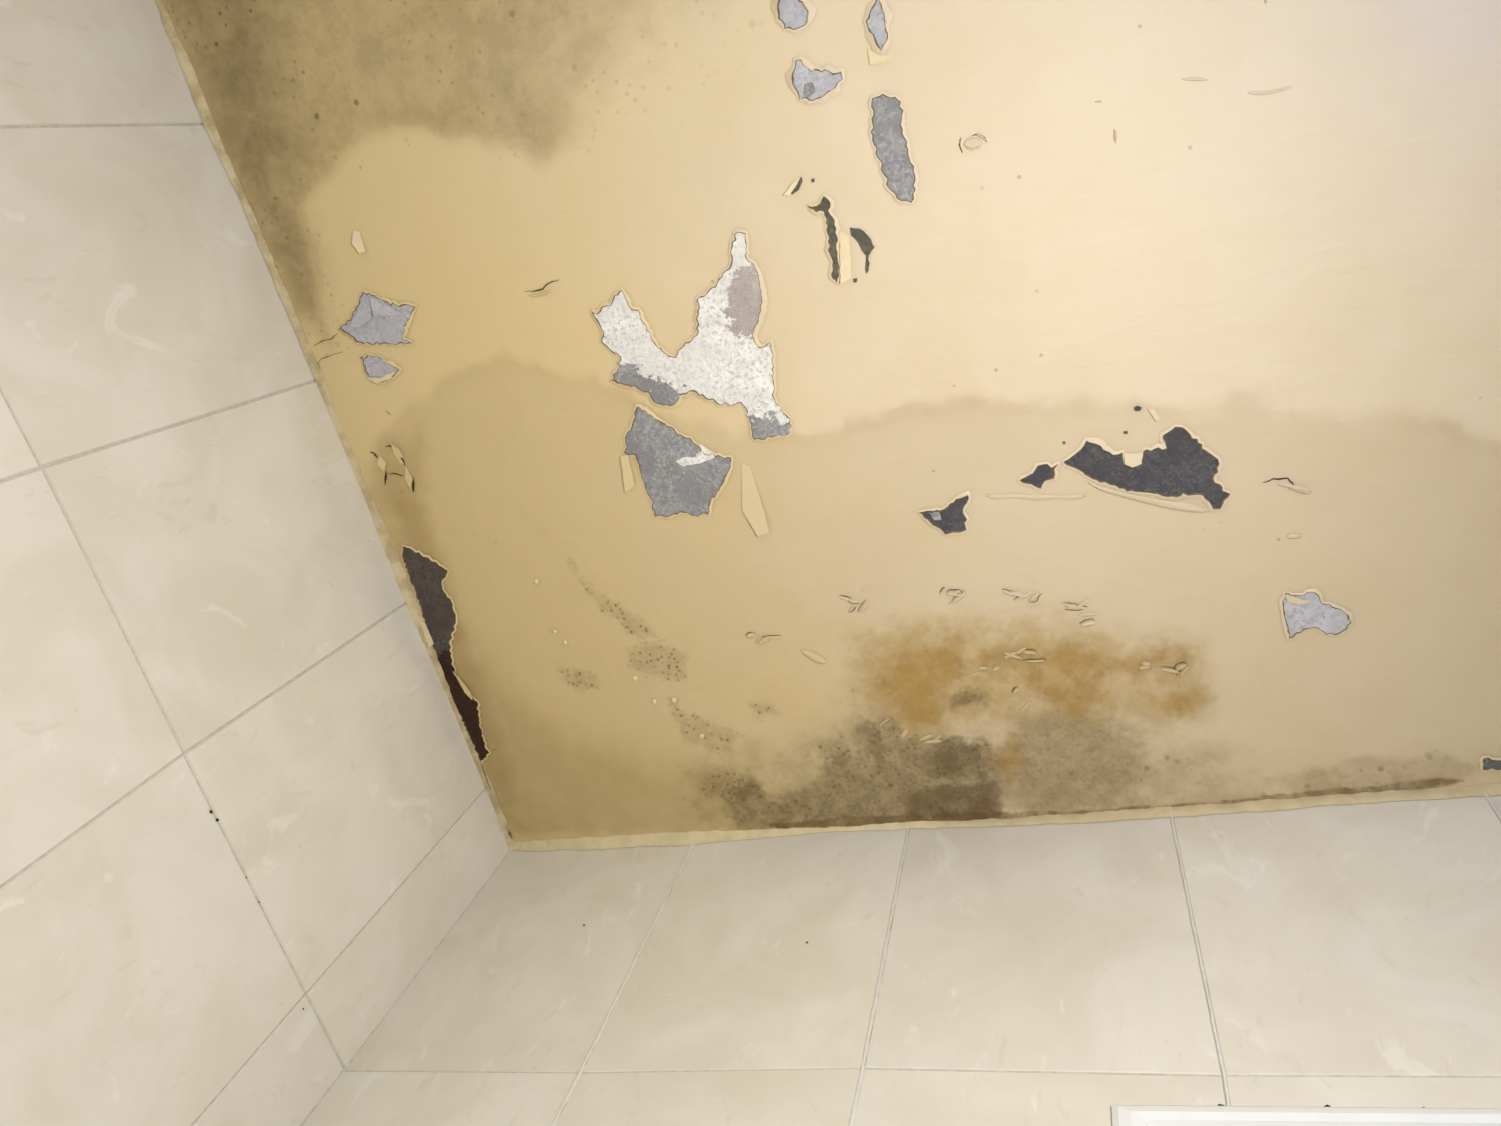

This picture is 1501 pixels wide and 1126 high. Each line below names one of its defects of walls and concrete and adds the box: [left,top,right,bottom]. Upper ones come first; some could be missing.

peeling [771,0,816,33]
peeling [785,56,845,105]
peeling [862,0,893,65]
peeling [868,91,919,206]
peeling [784,176,874,285]
peeling [337,289,417,385]
peeling [589,229,793,536]
peeling [1017,406,1232,512]
peeling [916,491,972,536]
peeling [401,544,491,763]
peeling [1279,589,1355,640]
leakage [737,724,998,829]